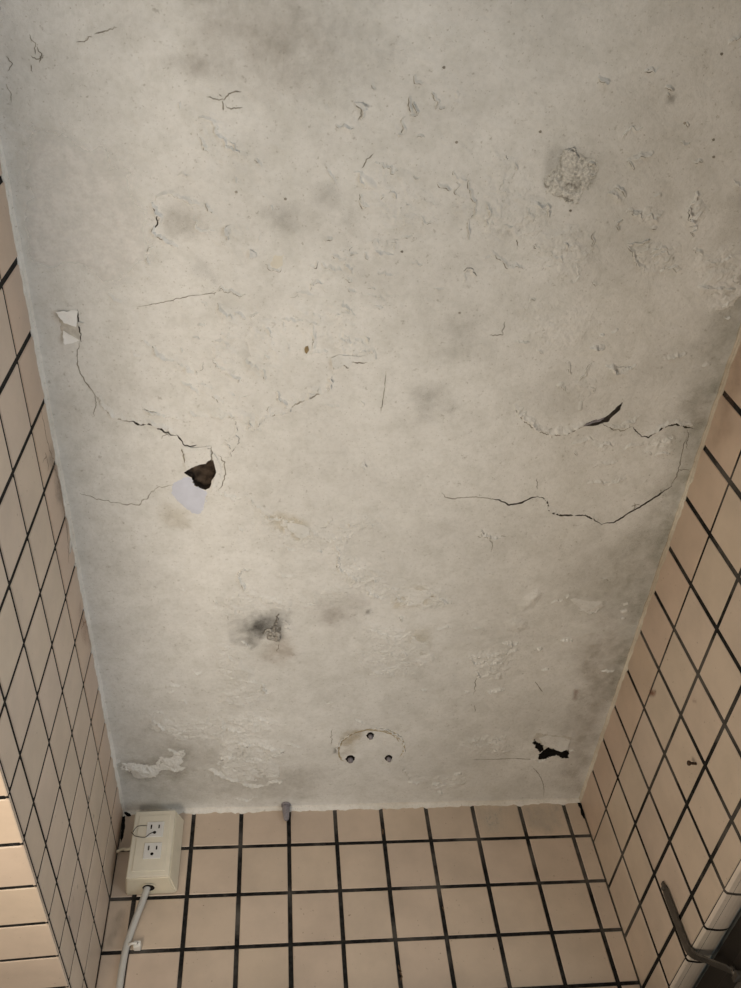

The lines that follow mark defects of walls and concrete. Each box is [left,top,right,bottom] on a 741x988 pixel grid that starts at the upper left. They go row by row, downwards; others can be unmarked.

spalling [544,147,599,204]
peeling [56,310,84,345]
crack [77,346,196,447]
crack [41,411,169,557]
spalling [171,446,249,514]
crack [442,403,695,525]
water stain [255,615,291,651]
spalling [116,748,188,780]
spalling [530,733,576,763]